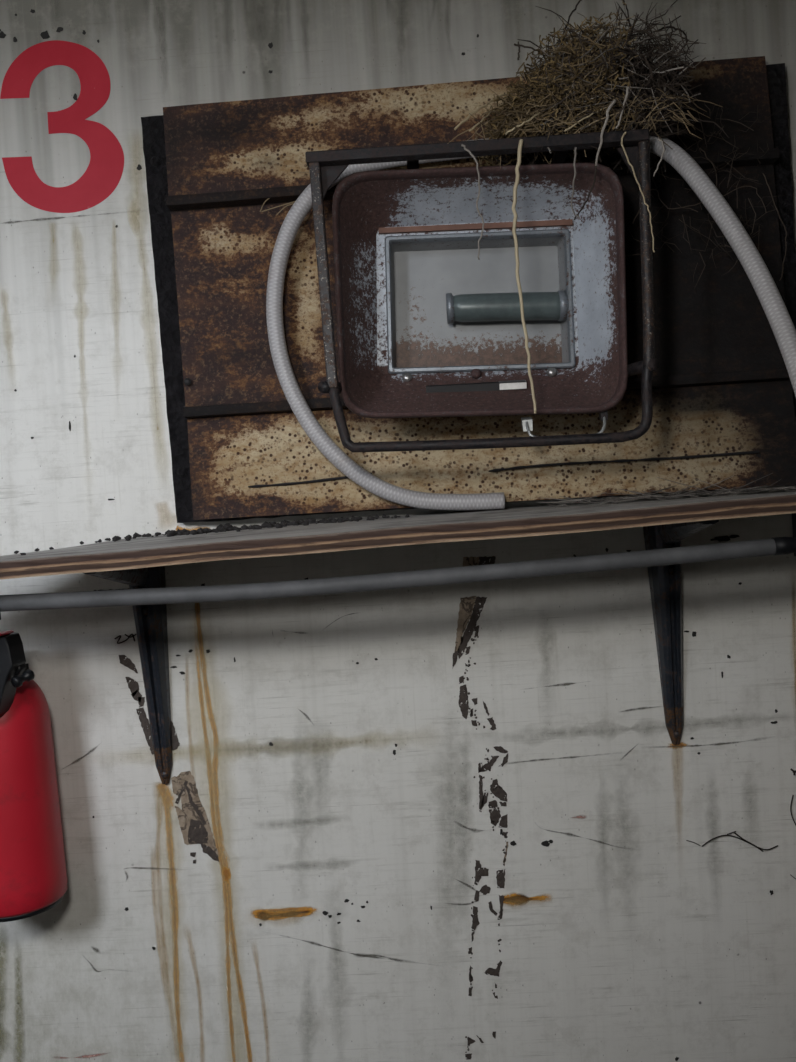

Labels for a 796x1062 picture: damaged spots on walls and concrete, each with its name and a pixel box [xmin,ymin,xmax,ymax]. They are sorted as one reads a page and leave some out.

peeling [462,556,496,567]
peeling [452,596,496,730]
rust [158,784,184,1062]
peeling [171,771,219,864]
rust [195,603,252,1062]
rust [253,907,316,920]
peeling [468,746,516,999]
rust [503,893,548,905]
damp [0,940,22,1062]
peeling [465,1032,496,1060]